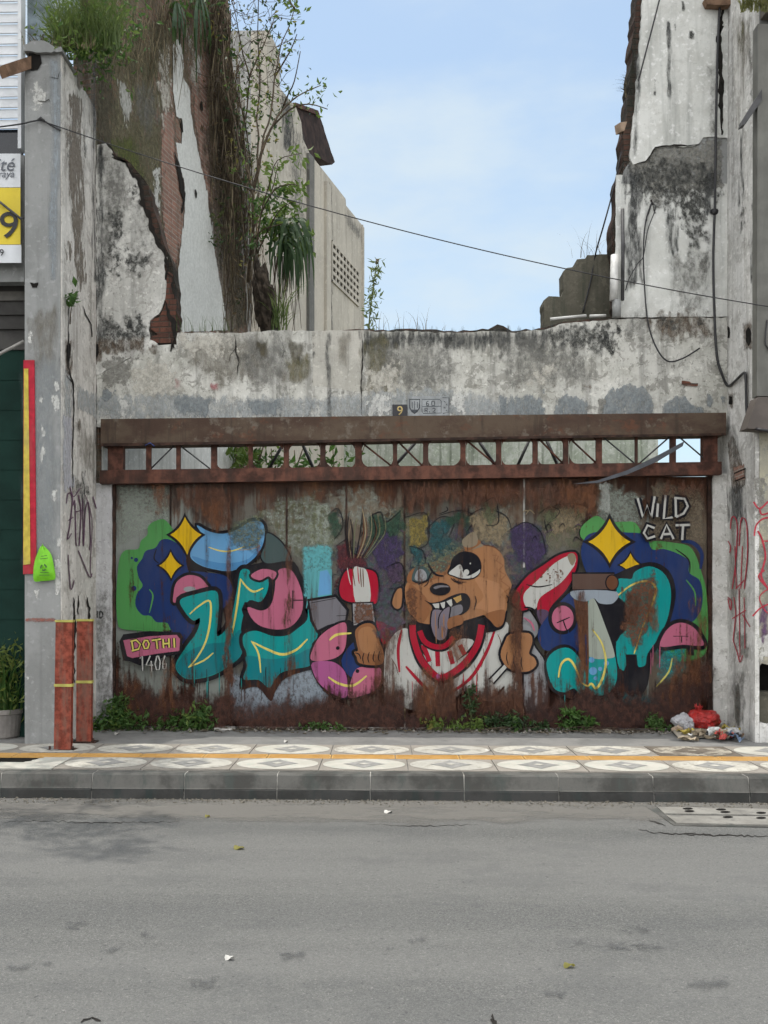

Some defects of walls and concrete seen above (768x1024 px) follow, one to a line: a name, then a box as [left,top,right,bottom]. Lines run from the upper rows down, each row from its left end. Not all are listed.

leakage [89,52,150,305]
leakage [97,314,151,355]
leakage [282,95,306,234]
leakage [313,324,346,414]
peeling [97,28,725,419]
leakage [364,153,721,392]
rust [111,478,714,732]
crack [638,819,764,837]